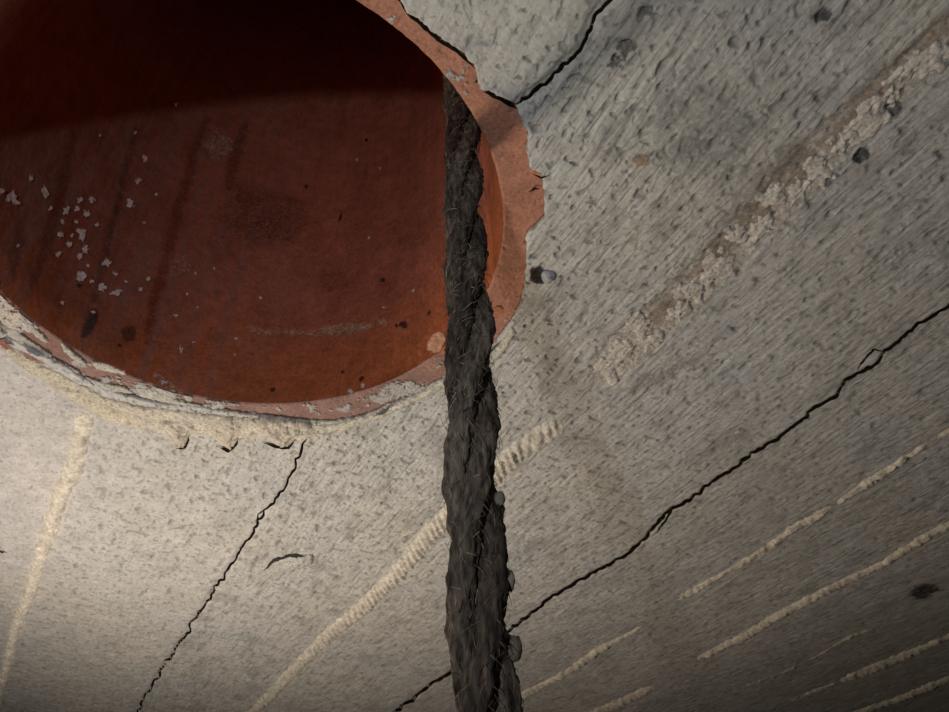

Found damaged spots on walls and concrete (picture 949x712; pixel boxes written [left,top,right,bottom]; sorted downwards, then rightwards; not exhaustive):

crack [398,0,475,68]
peeling [445,65,468,95]
crack [483,0,613,109]
spalling [529,267,544,284]
peeling [0,295,239,409]
peeling [427,332,446,378]
peeling [302,381,428,416]
crack [507,304,949,633]
crack [137,439,307,712]
crack [394,669,452,712]